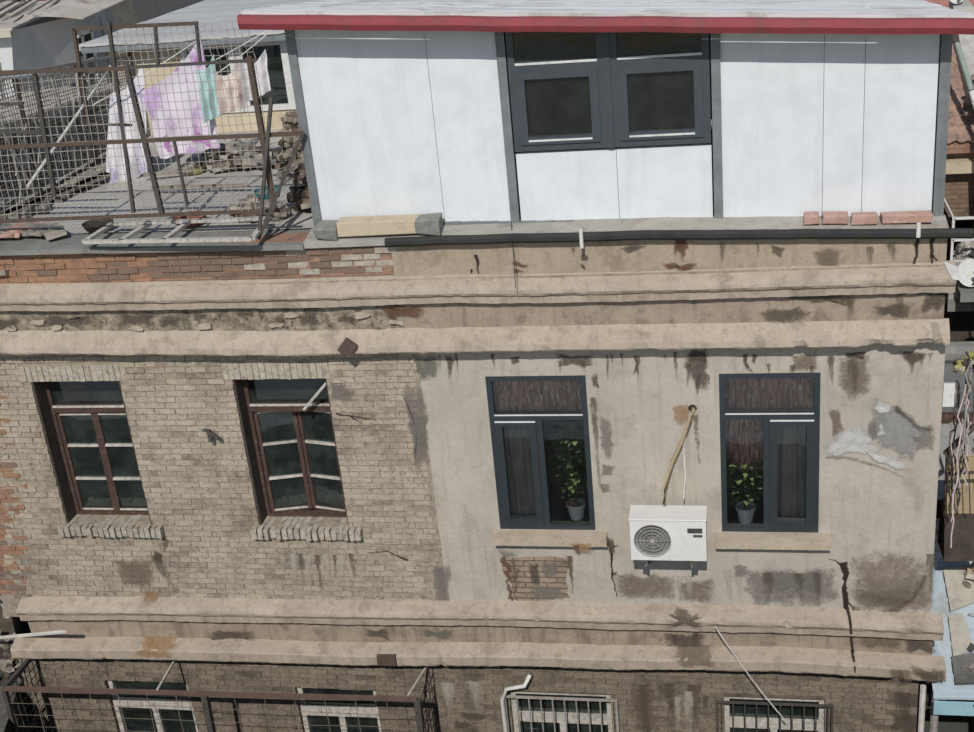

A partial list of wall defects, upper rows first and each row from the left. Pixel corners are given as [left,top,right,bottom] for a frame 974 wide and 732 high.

damp [417,354,458,379]
damp [673,349,709,391]
damp [790,355,815,373]
damp [828,352,868,394]
damp [903,351,925,368]
damp [404,388,426,465]
spalling [825,400,933,470]
flaking render [0,387,30,594]
damp [434,568,450,600]
peeling [498,549,573,601]
damp [853,554,935,611]
crack [830,559,856,673]